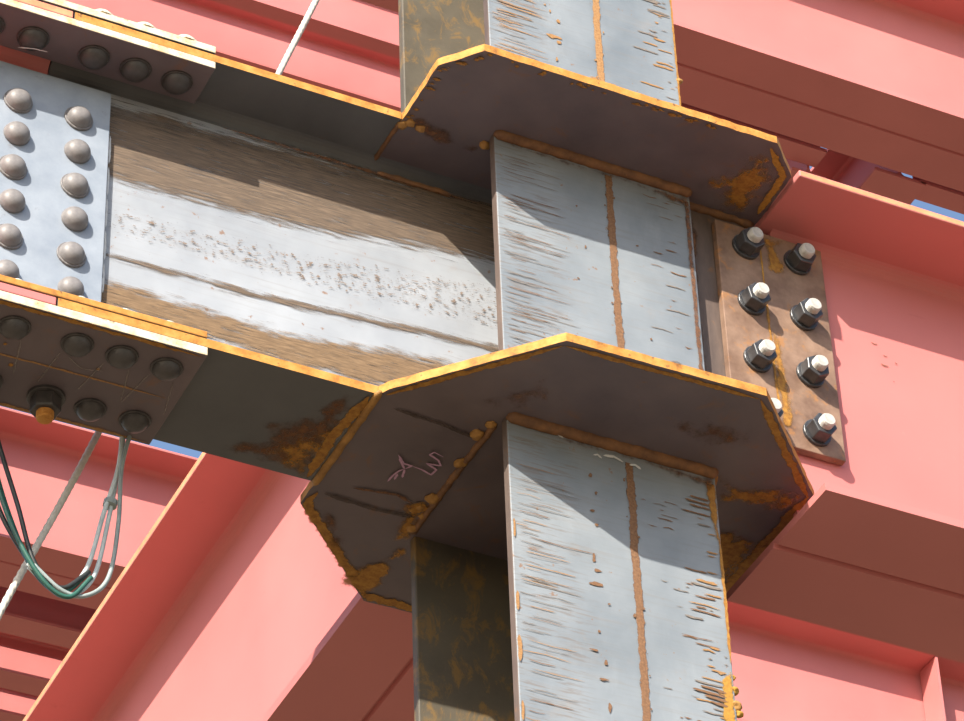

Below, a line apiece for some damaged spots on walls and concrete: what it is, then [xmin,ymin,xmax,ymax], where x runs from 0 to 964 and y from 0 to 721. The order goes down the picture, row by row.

corrosion [101,98,809,721]